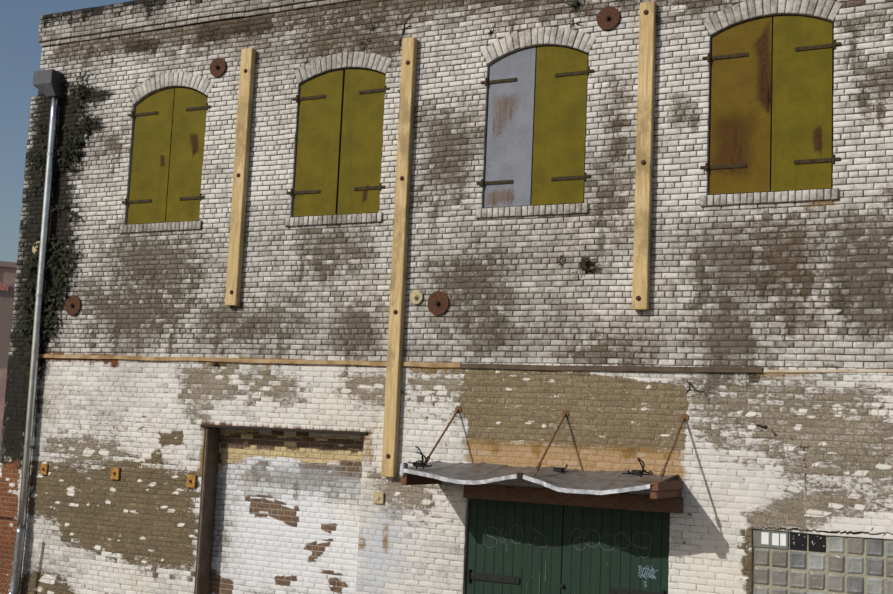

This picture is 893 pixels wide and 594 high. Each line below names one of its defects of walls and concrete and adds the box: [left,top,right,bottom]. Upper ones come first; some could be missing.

rust [757,30,771,111]
water stain [837,8,893,128]
water stain [411,105,483,229]
water stain [587,75,634,256]
water stain [0,0,466,467]
water stain [428,254,518,359]
water stain [569,333,652,372]
water stain [688,214,893,404]
peeling [0,361,308,594]
peeling [218,429,445,520]
peeling [408,362,893,594]
peeling [304,519,347,594]